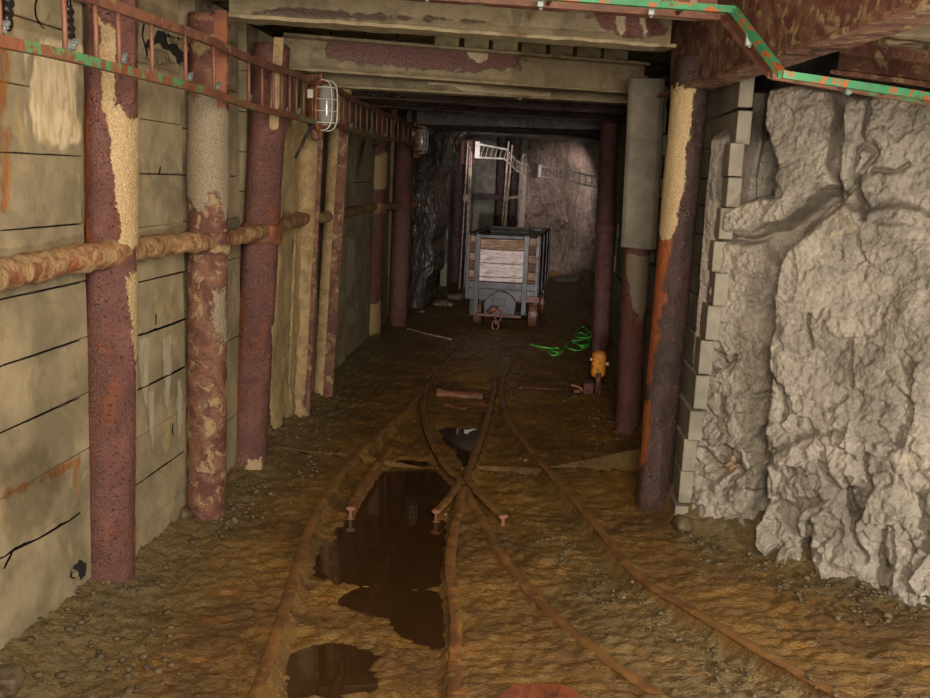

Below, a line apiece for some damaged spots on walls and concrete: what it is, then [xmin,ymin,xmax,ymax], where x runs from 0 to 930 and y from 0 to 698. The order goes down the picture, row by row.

corrosion [646,239,672,385]
corrosion [638,401,651,469]
crack [0,512,80,569]